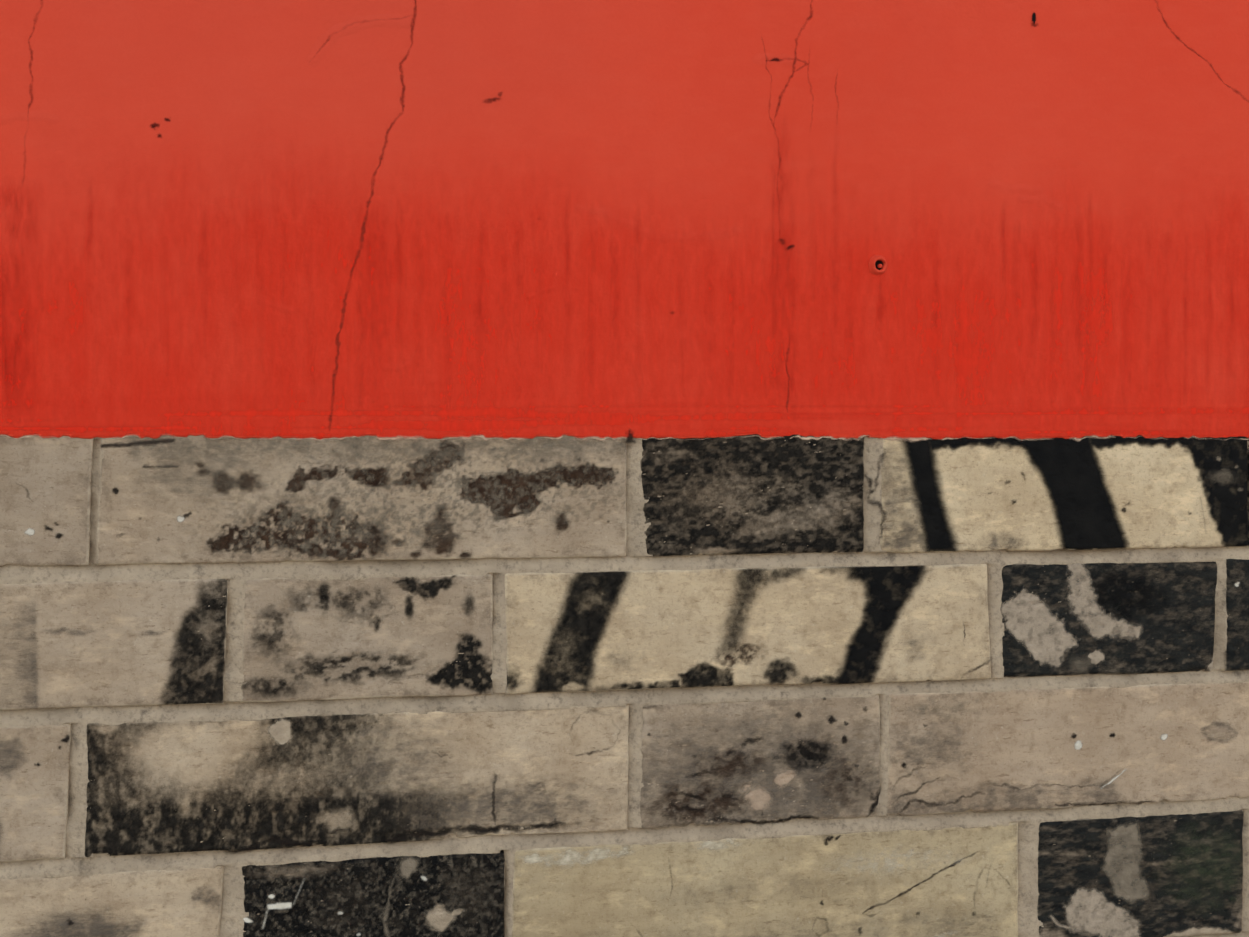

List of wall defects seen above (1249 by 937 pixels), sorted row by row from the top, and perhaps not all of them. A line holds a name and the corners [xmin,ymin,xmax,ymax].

crack [329,0,416,422]
water stain [0,223,1249,554]
water stain [643,721,871,825]